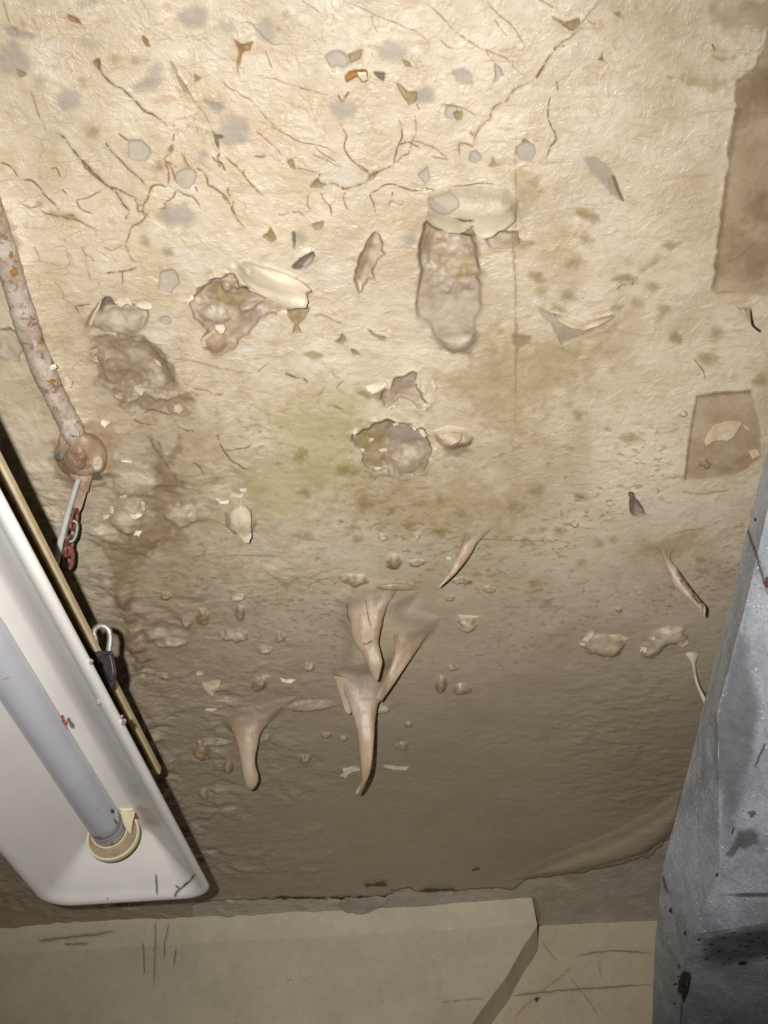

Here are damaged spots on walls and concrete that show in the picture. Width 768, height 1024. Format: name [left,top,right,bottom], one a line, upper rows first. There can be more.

crack [2,41,563,280]
peeling [86,297,193,415]
spalling [182,273,289,356]
spalling [355,232,385,293]
spalling [409,221,519,353]
peeling [554,315,615,331]
spalling [352,372,438,477]
leakage [704,420,750,446]
peeling [340,766,360,779]